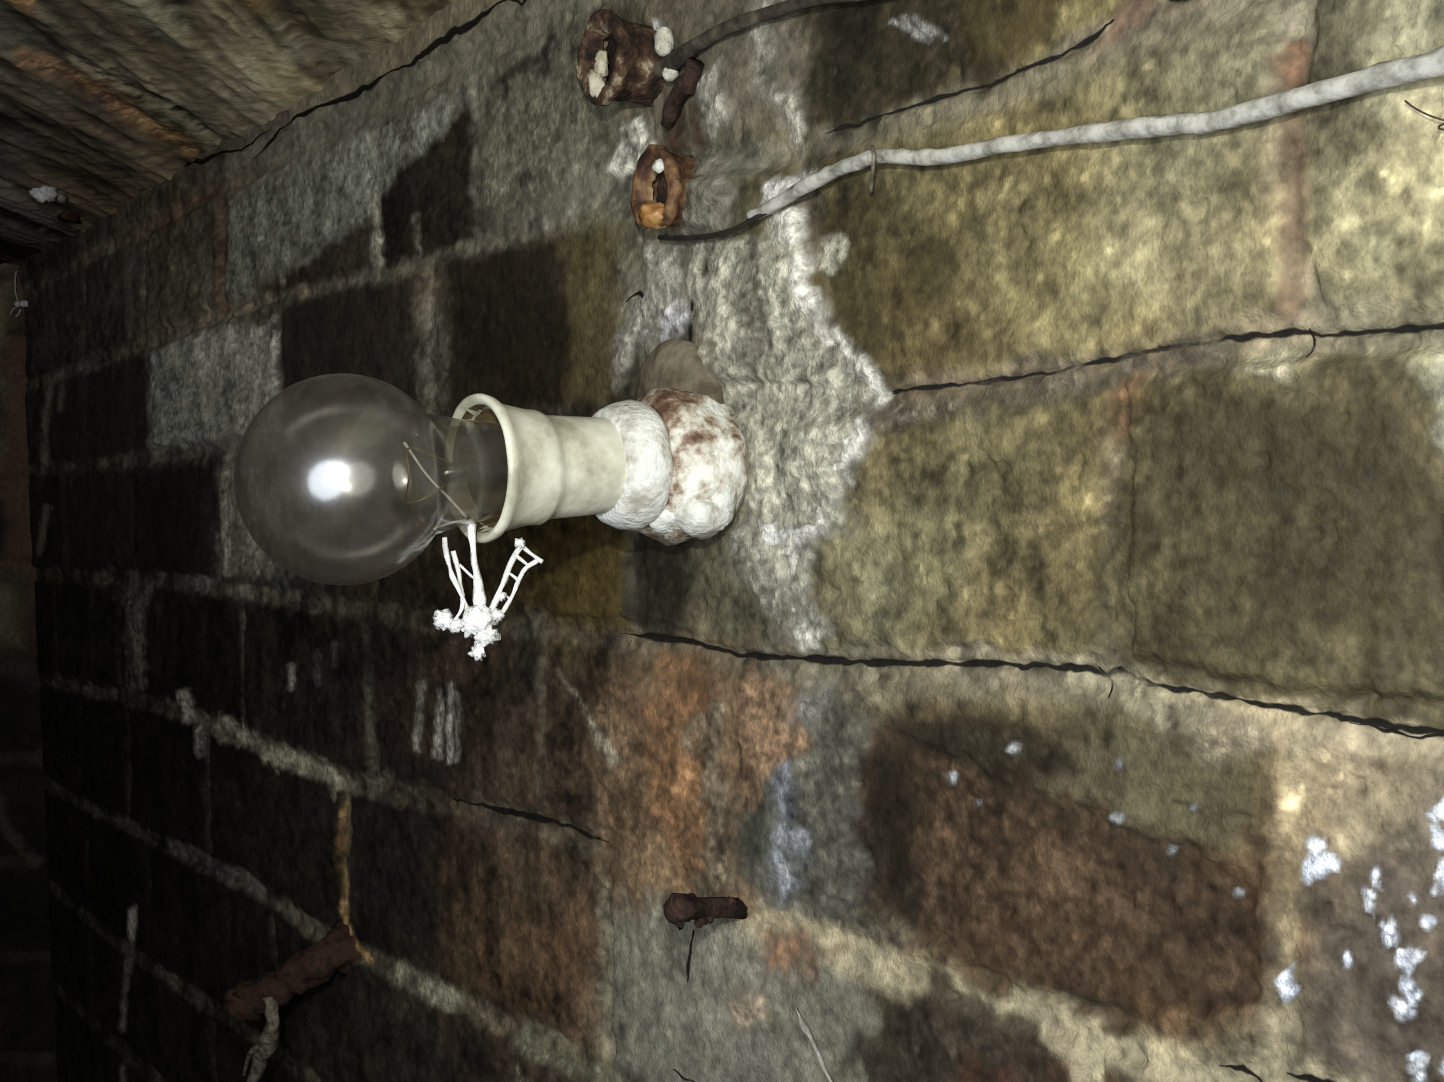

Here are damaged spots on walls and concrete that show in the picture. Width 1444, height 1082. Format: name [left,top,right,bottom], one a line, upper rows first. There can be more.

crack [183,0,526,167]
leakage [606,117,655,178]
leakage [696,65,728,140]
crack [827,19,1115,133]
leakage [613,171,889,649]
crack [885,322,1444,394]
crack [621,633,1444,739]
rust [588,655,811,931]
rust [335,801,373,963]
leakage [1300,839,1339,905]
leakage [1276,969,1298,1002]
leakage [1325,799,1444,1082]